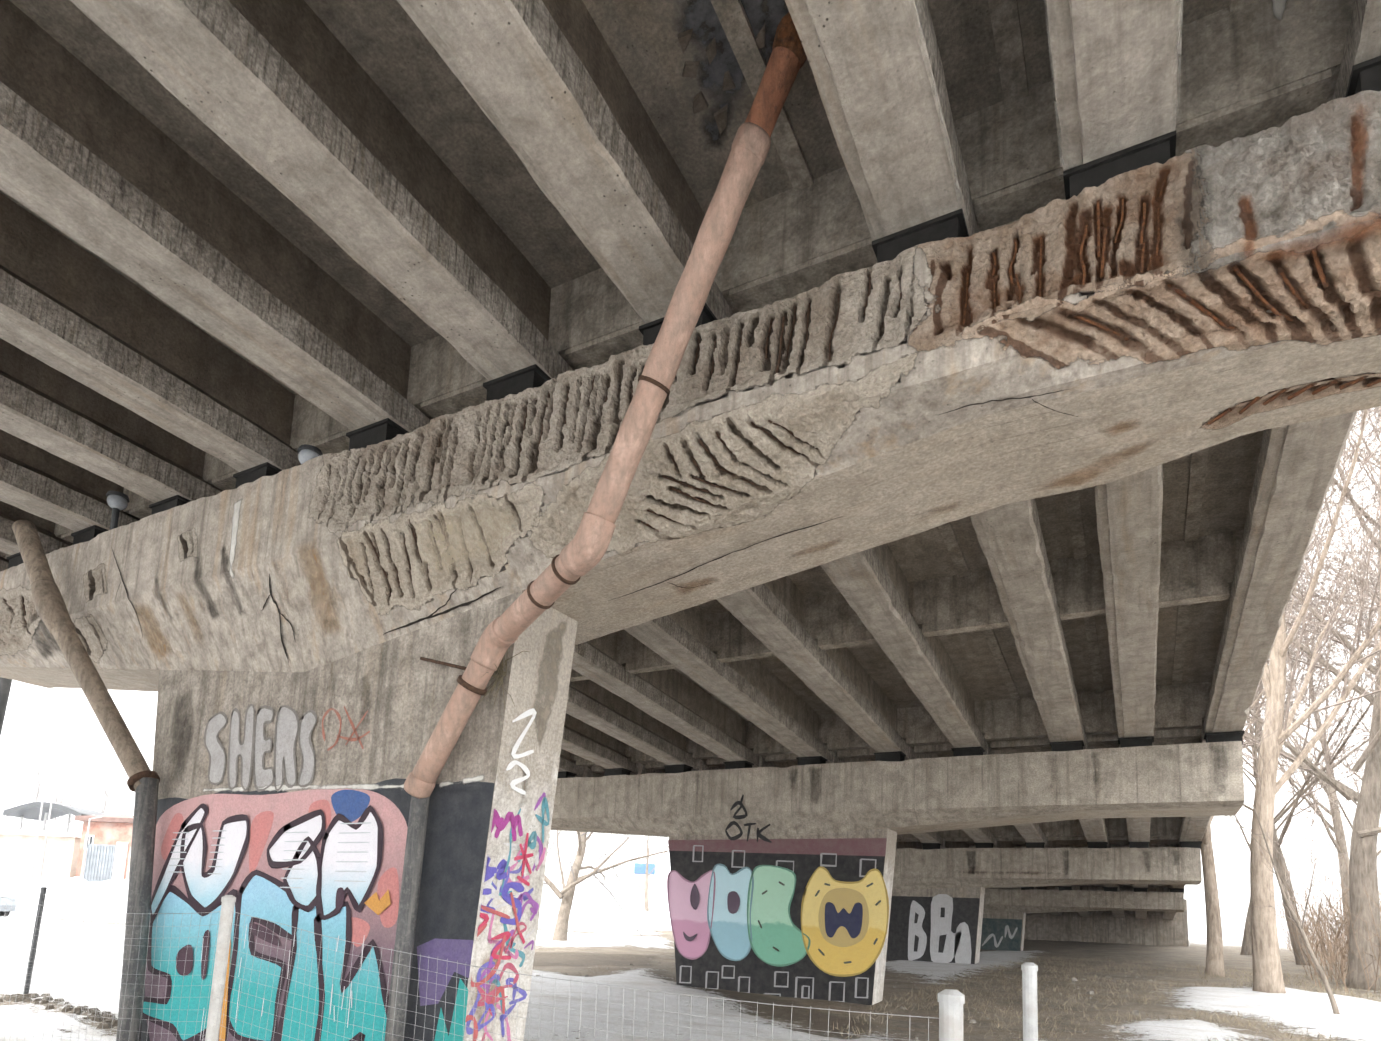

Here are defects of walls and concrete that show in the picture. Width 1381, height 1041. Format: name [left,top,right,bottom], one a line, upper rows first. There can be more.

leakage [681,0,746,146]
leakage [740,0,789,62]
spalling [606,90,1381,555]
crack [939,389,1078,417]
spalling [308,343,654,615]
spalling [0,586,41,655]
crack [261,573,296,662]
crack [383,587,501,635]